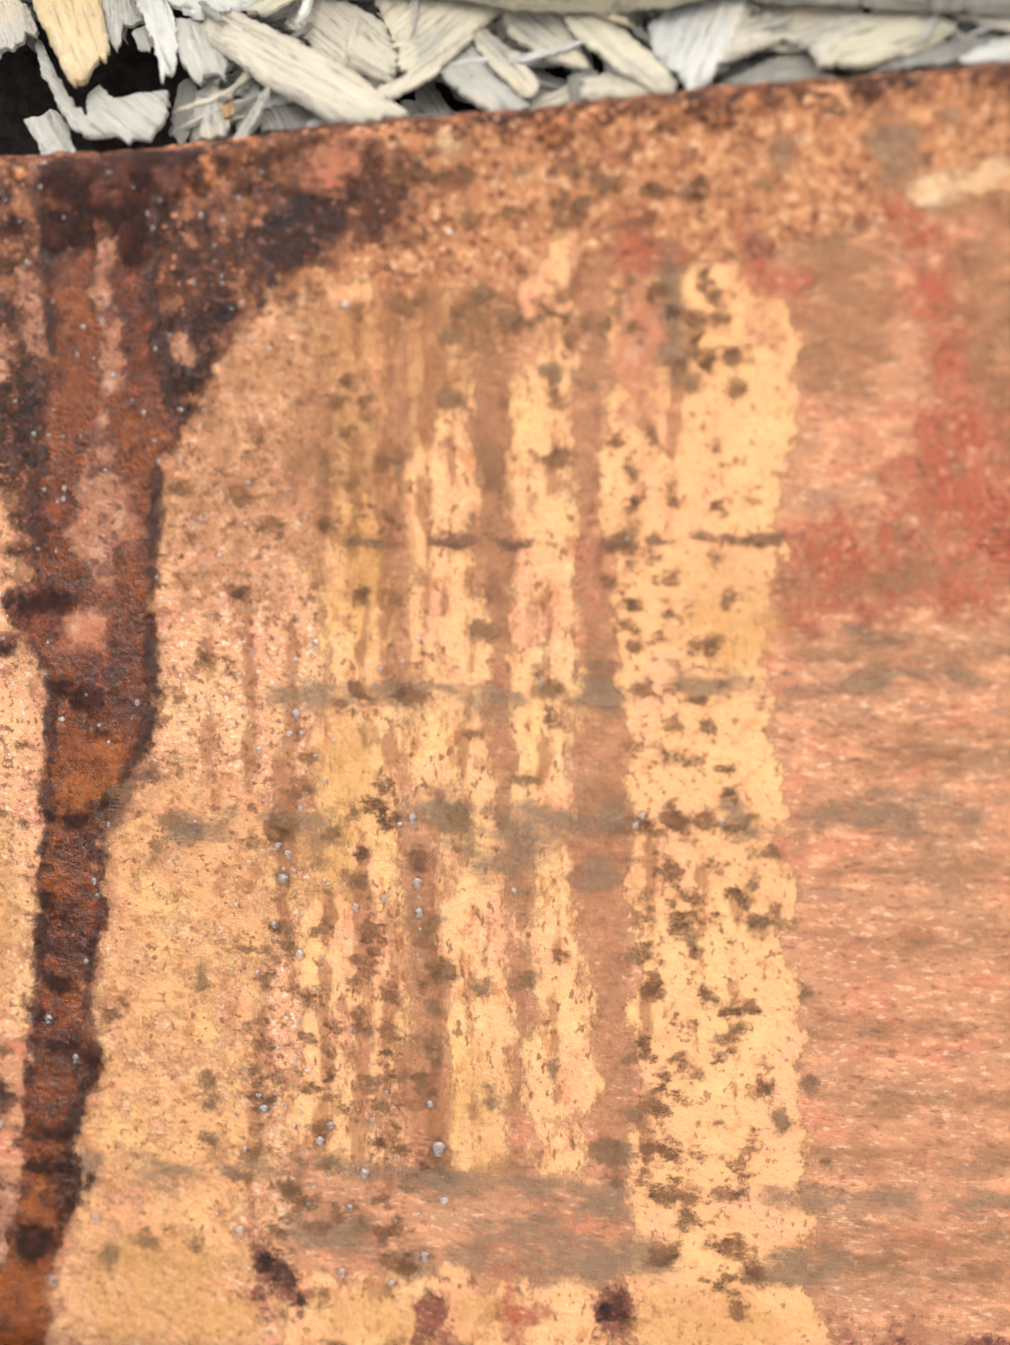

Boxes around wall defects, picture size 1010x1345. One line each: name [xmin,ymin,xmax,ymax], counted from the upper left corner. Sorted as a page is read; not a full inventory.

leakage [428,531,530,550]
leakage [599,531,674,553]
leakage [692,531,785,548]
leakage [671,677,749,697]
leakage [416,790,772,892]
rust [0,1078,20,1118]
leakage [576,1128,759,1216]
rust [0,1179,23,1265]
leakage [449,1215,676,1285]
leakage [716,1233,852,1287]
rust [872,1316,926,1345]
rust [939,1336,1010,1345]